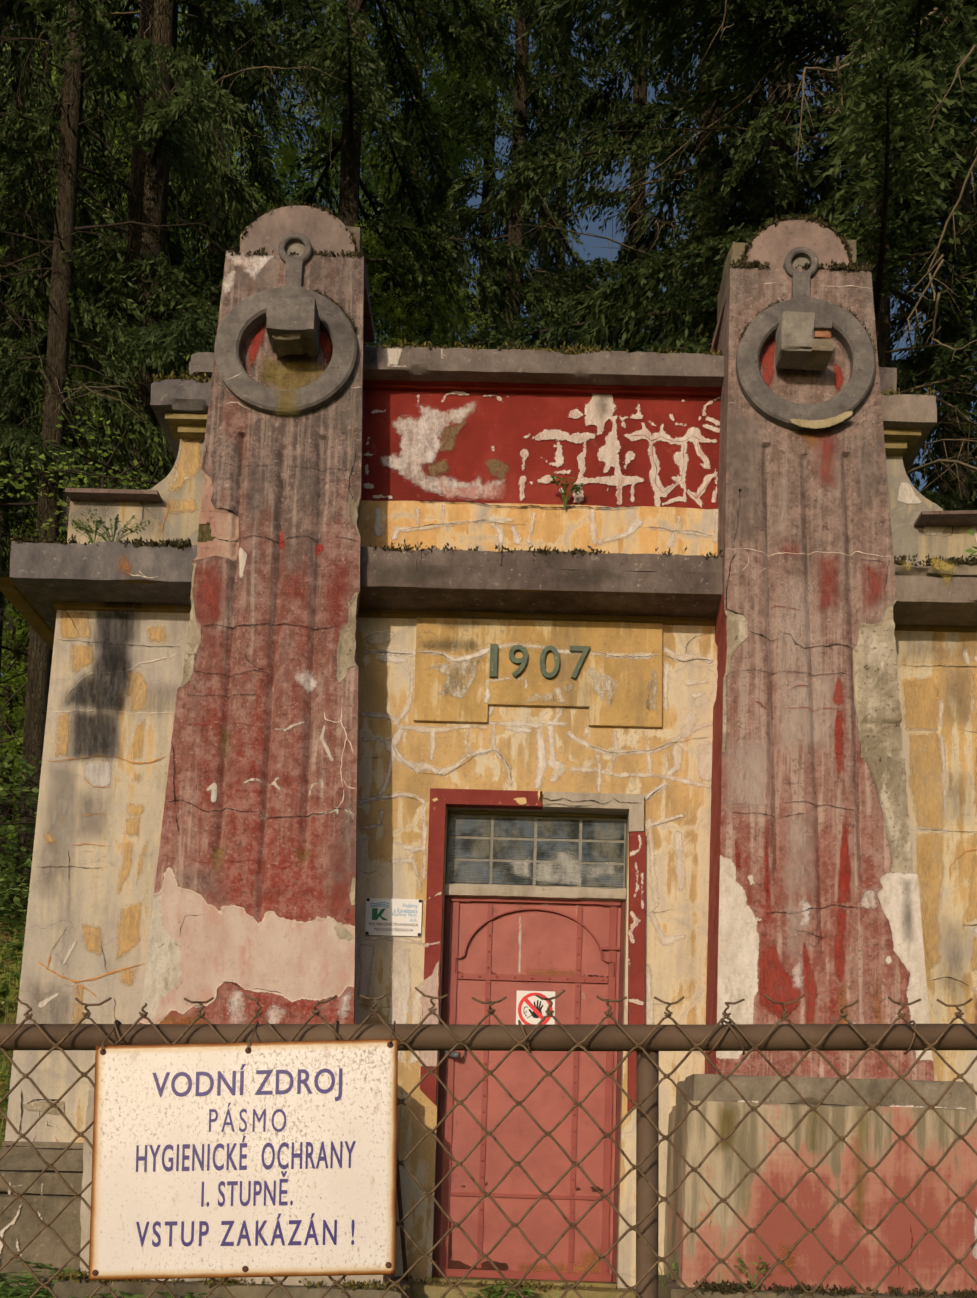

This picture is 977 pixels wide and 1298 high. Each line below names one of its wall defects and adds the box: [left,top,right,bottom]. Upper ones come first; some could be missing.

peeling [417,391,503,402]
damp [68,602,140,757]
crack [42,612,511,895]
peeling [328,394,748,899]
crack [544,785,685,828]
crack [402,435,890,712]
flaking render [833,567,948,1024]
peeling [118,867,440,1024]
peeling [717,841,817,1024]
peeling [398,1051,437,1067]
peeling [716,1051,743,1060]
peeling [915,1050,933,1061]